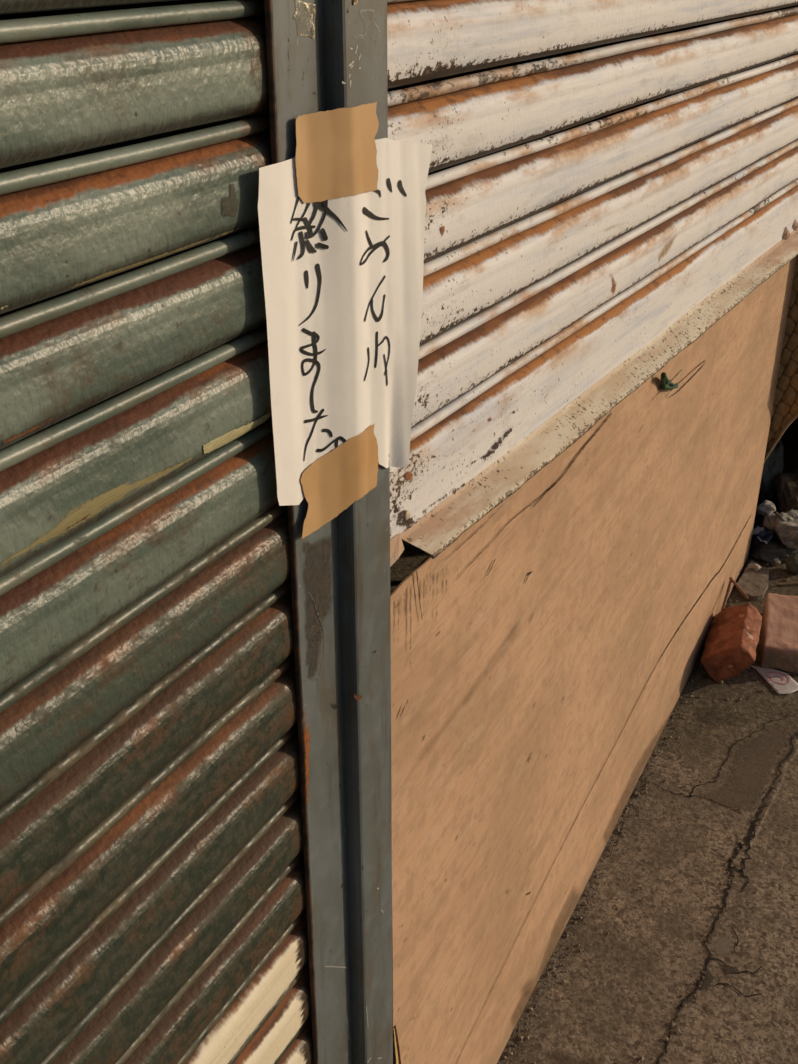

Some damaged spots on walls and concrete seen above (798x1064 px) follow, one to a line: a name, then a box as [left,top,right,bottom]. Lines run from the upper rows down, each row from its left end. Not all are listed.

crack [730,825,755,893]
crack [709,925,768,996]